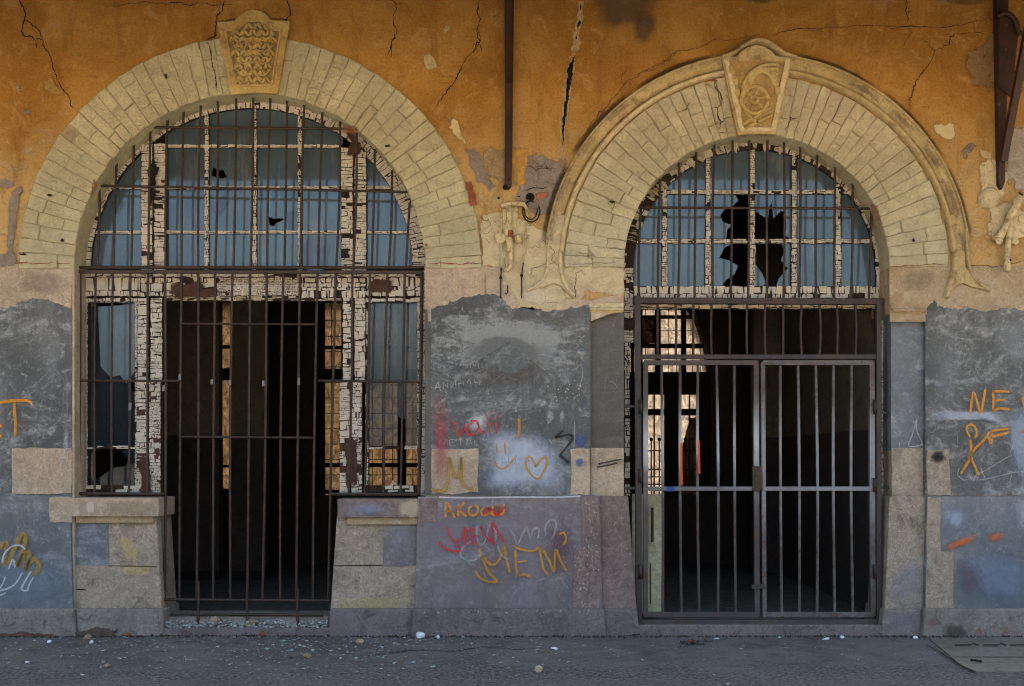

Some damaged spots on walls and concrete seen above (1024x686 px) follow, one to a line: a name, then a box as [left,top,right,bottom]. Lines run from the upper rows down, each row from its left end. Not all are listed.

peeling [0,178,26,267]
crack [19,0,72,107]
peeling [146,159,159,206]
crack [386,0,402,58]
crack [435,5,482,108]
flaking render [449,119,567,215]
leakage [602,0,653,40]
crack [534,0,993,179]
peeling [934,122,955,139]
flaking render [965,34,994,92]
flaking render [987,125,1024,238]
peeling [367,277,395,293]